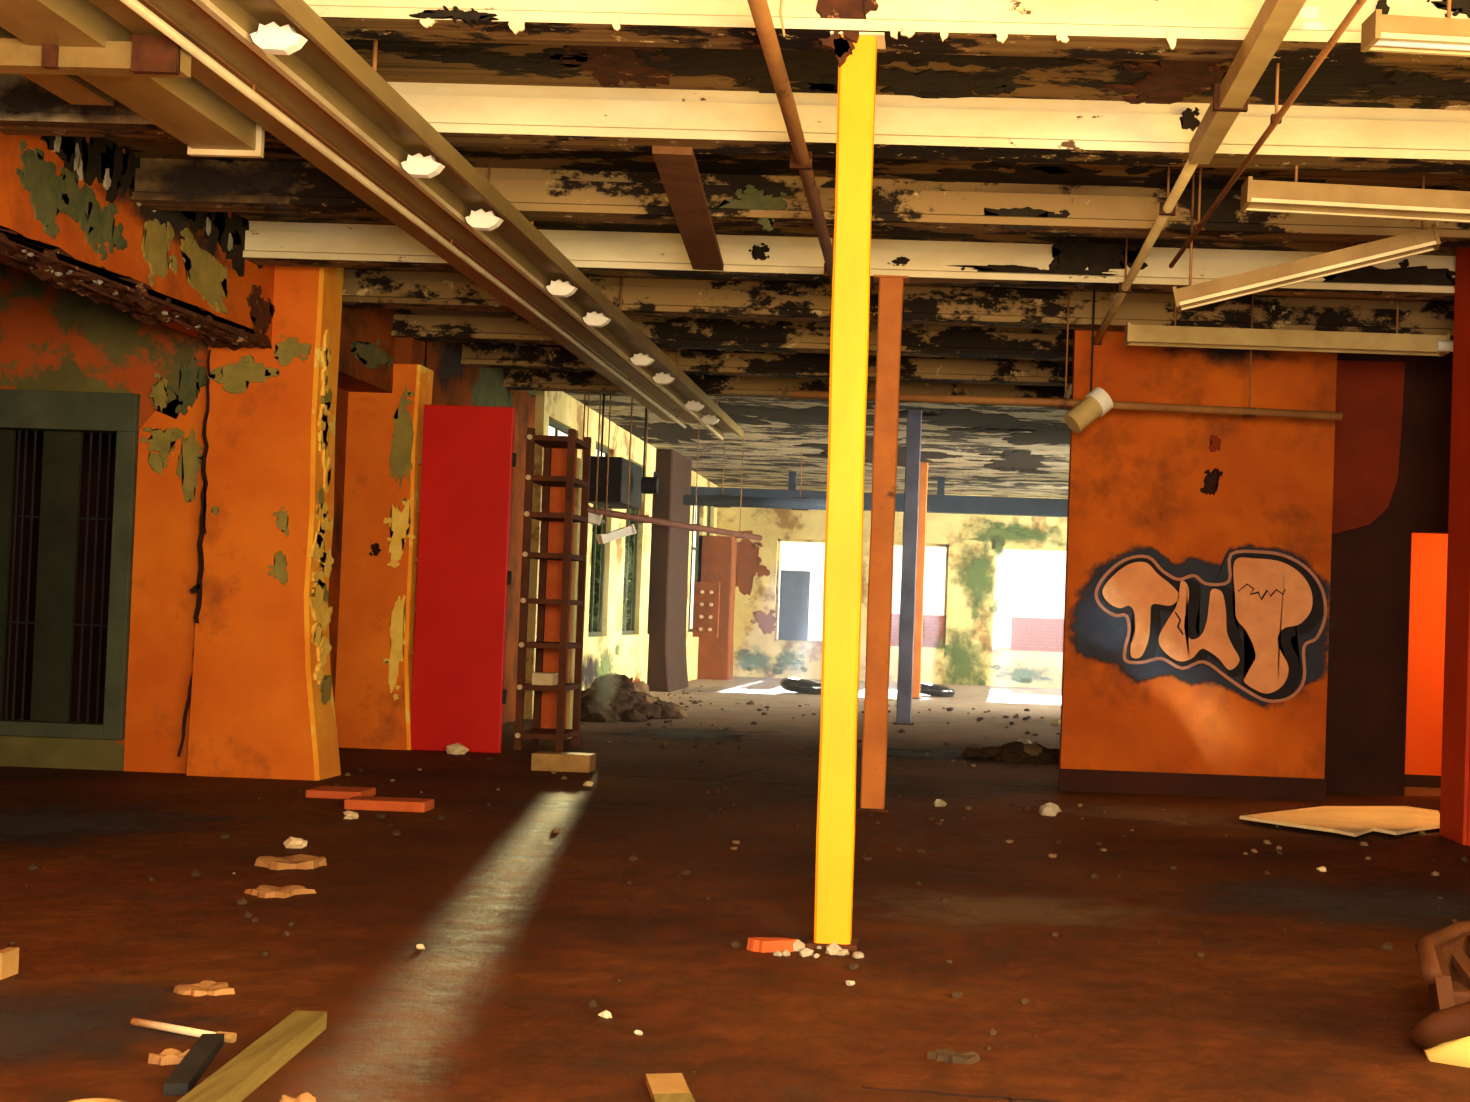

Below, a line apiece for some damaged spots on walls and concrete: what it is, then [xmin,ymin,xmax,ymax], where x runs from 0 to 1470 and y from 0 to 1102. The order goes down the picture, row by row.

peeling [409,5,525,35]
peeling [632,0,879,94]
peeling [876,25,1086,99]
peeling [1427,0,1470,18]
peeling [1180,107,1200,131]
peeling [887,162,1246,190]
peeling [947,207,1148,290]
peeling [1322,259,1455,296]
spalling [0,136,334,705]
peeling [615,416,720,443]
peeling [897,405,1070,473]
peeling [369,384,415,568]